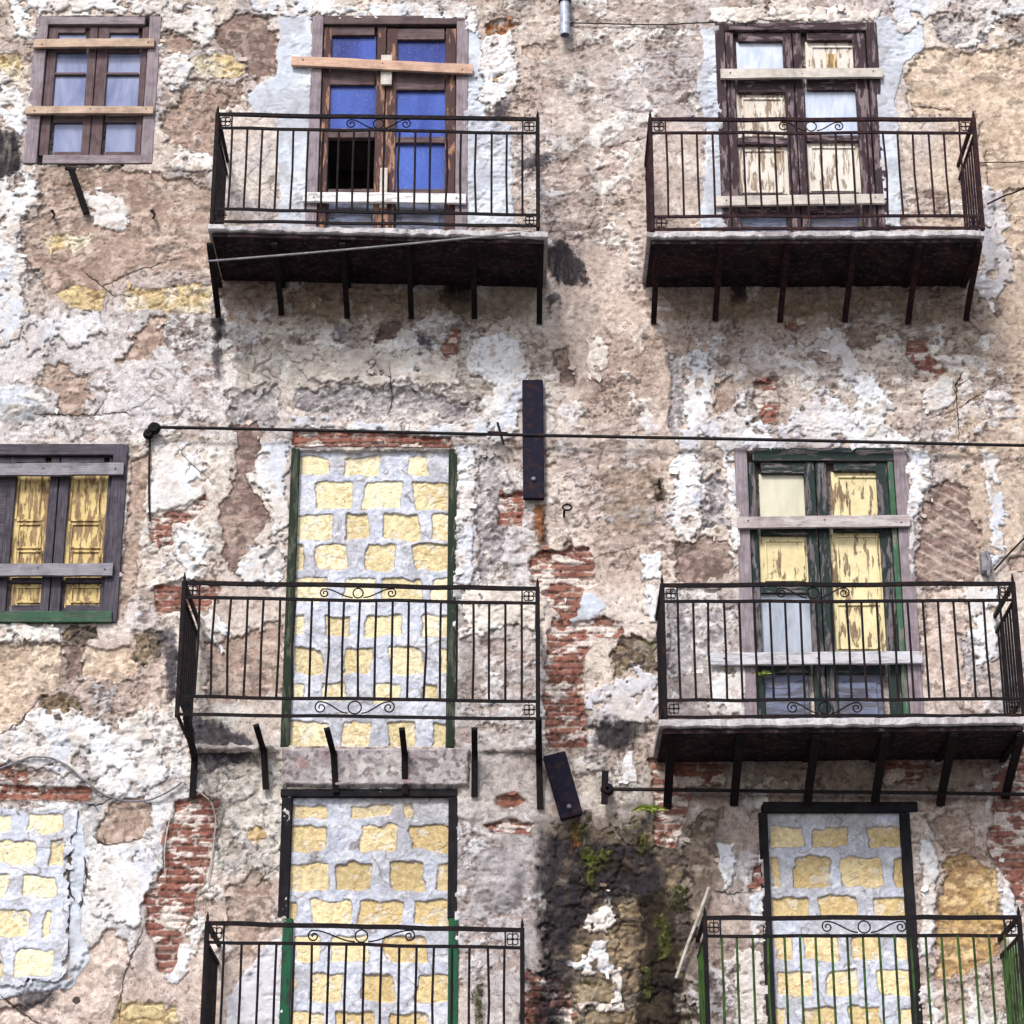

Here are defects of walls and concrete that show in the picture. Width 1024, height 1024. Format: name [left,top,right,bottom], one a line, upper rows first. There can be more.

crack [83,257,184,297]
flaking render [118,311,1024,775]
flaking render [0,623,286,1024]
flaking render [483,791,534,834]
spalling [519,758,737,1024]
leakage [635,888,683,1024]
flaking render [917,745,1024,1024]